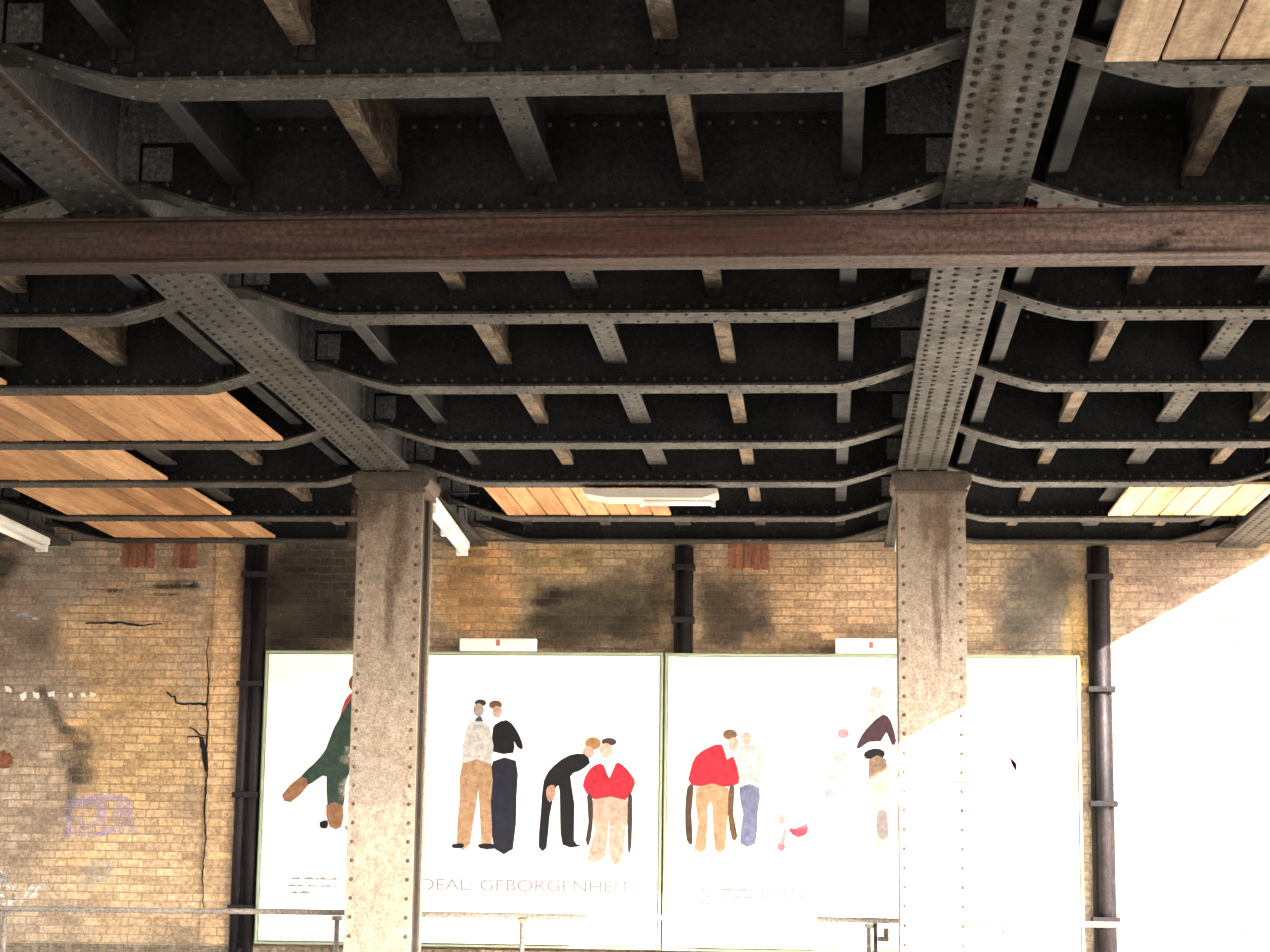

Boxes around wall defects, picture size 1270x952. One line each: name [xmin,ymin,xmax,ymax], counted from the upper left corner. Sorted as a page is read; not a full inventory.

water stain [150,579,215,596]
water stain [531,575,671,643]
water stain [37,689,93,803]
crack [166,637,210,908]